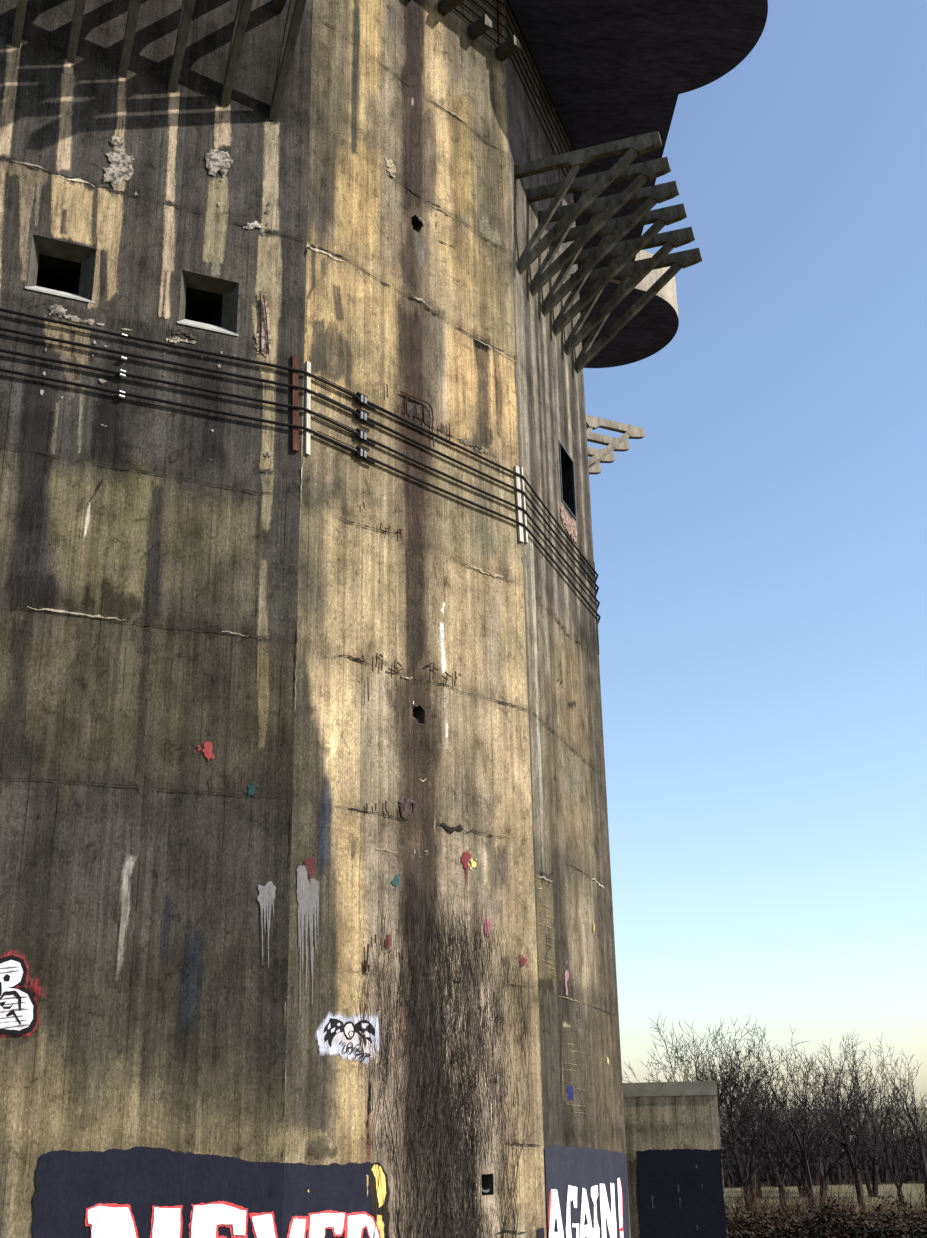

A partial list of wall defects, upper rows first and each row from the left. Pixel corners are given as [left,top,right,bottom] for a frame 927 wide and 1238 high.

spalling [102,136,134,188]
spalling [205,147,233,181]
leakage [352,0,360,153]
leakage [402,0,436,211]
leakage [391,230,448,1053]
crack [434,819,511,840]